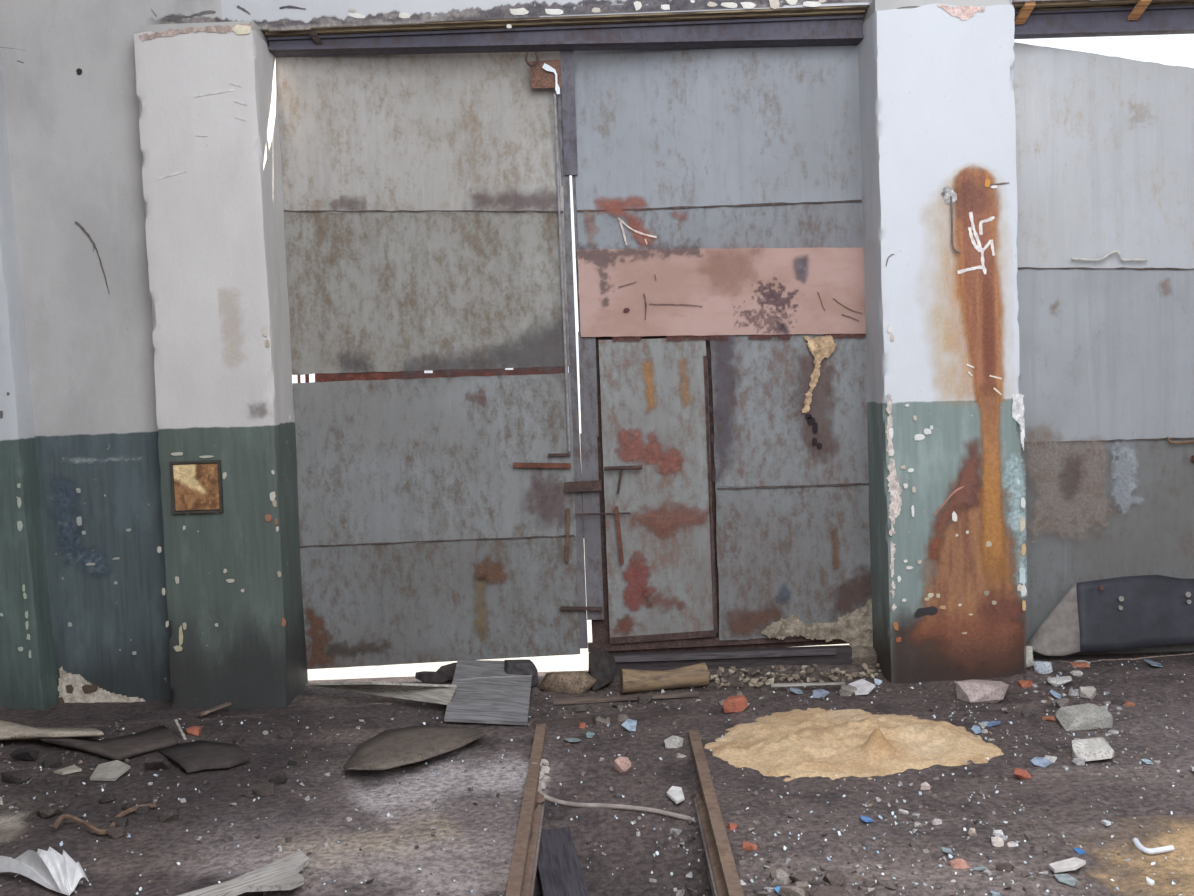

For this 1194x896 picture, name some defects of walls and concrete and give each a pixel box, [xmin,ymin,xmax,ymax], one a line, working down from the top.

peeling [139,0,873,41]
rust [586,197,657,245]
crack [75,221,110,294]
rust [895,169,1027,683]
rust [615,429,684,474]
rust [633,507,709,536]
peeling [886,394,973,642]
rust [615,551,683,634]
spalling [58,667,145,703]